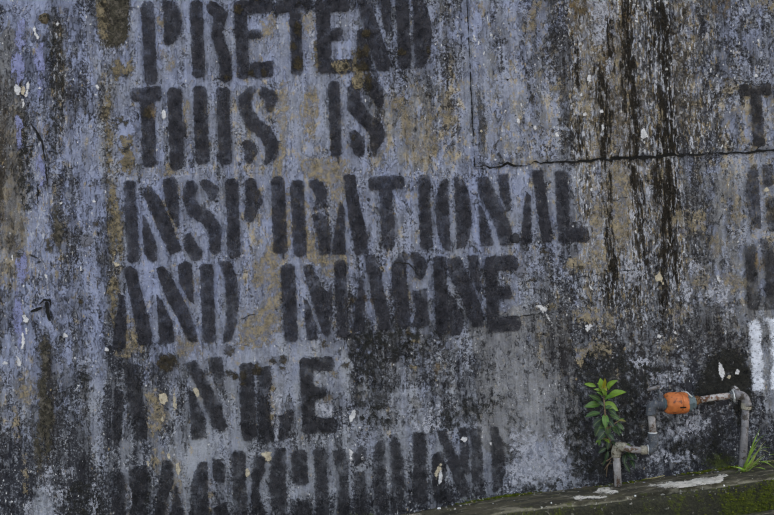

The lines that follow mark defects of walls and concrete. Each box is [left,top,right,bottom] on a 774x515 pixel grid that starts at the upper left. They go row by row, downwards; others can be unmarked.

peeling [95,0,135,81]
crack [466,0,474,137]
damp [475,88,487,153]
damp [574,113,585,160]
crack [473,149,774,169]
damp [587,0,703,333]
damp [44,207,65,253]
damp [705,279,734,316]
damp [33,334,104,515]
damp [313,395,333,417]
damp [329,319,440,438]
damp [412,343,755,499]